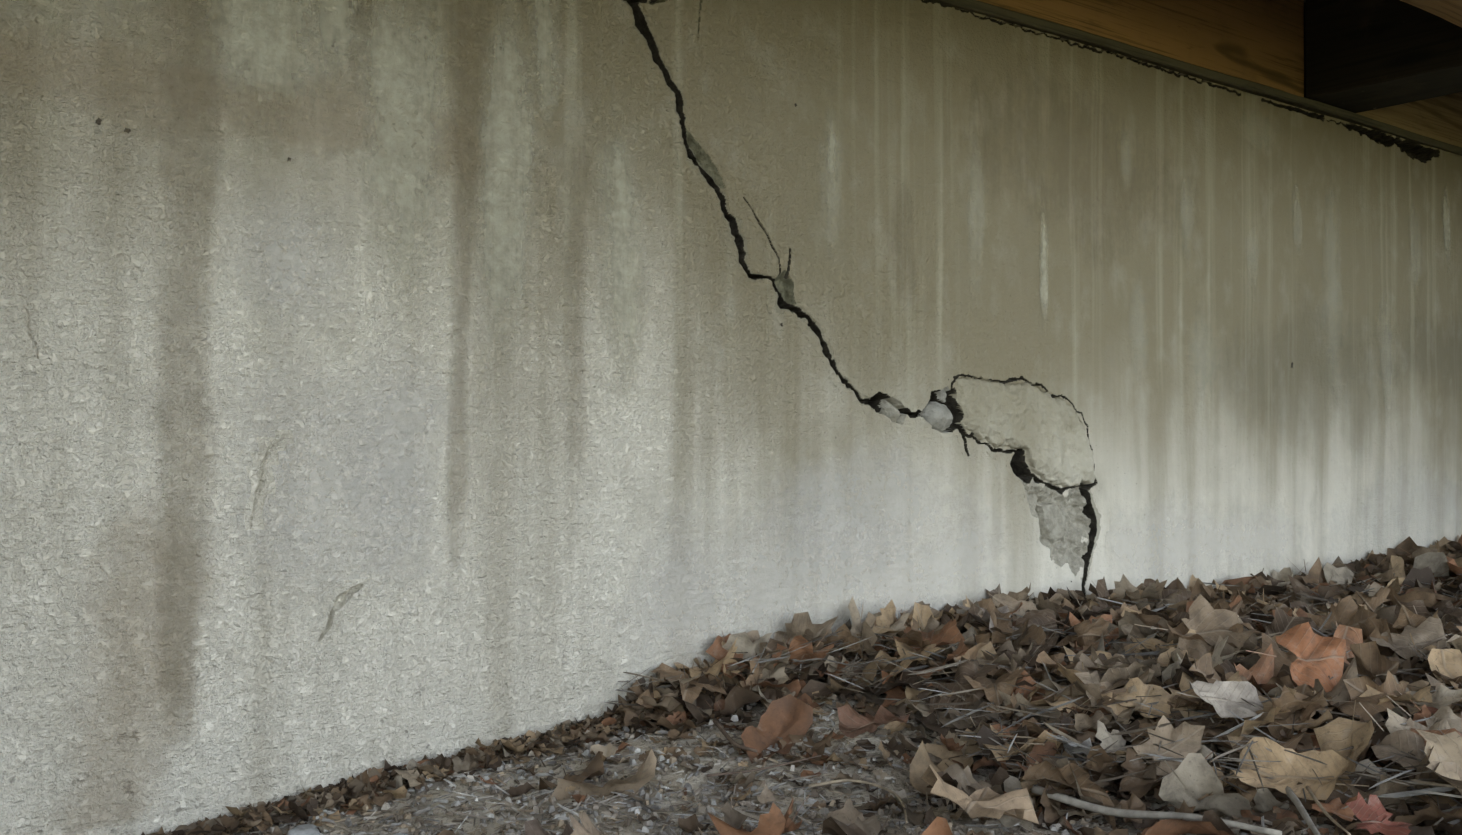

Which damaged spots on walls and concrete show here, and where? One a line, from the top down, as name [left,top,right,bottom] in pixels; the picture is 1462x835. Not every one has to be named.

leakage [211,0,301,91]
leakage [321,0,349,49]
leakage [373,18,433,252]
leakage [482,43,530,299]
leakage [613,161,637,336]
spalling [623,0,691,11]
crack [604,0,923,425]
spalling [896,0,1442,168]
spalling [1018,477,1091,585]
crack [1071,481,1110,597]